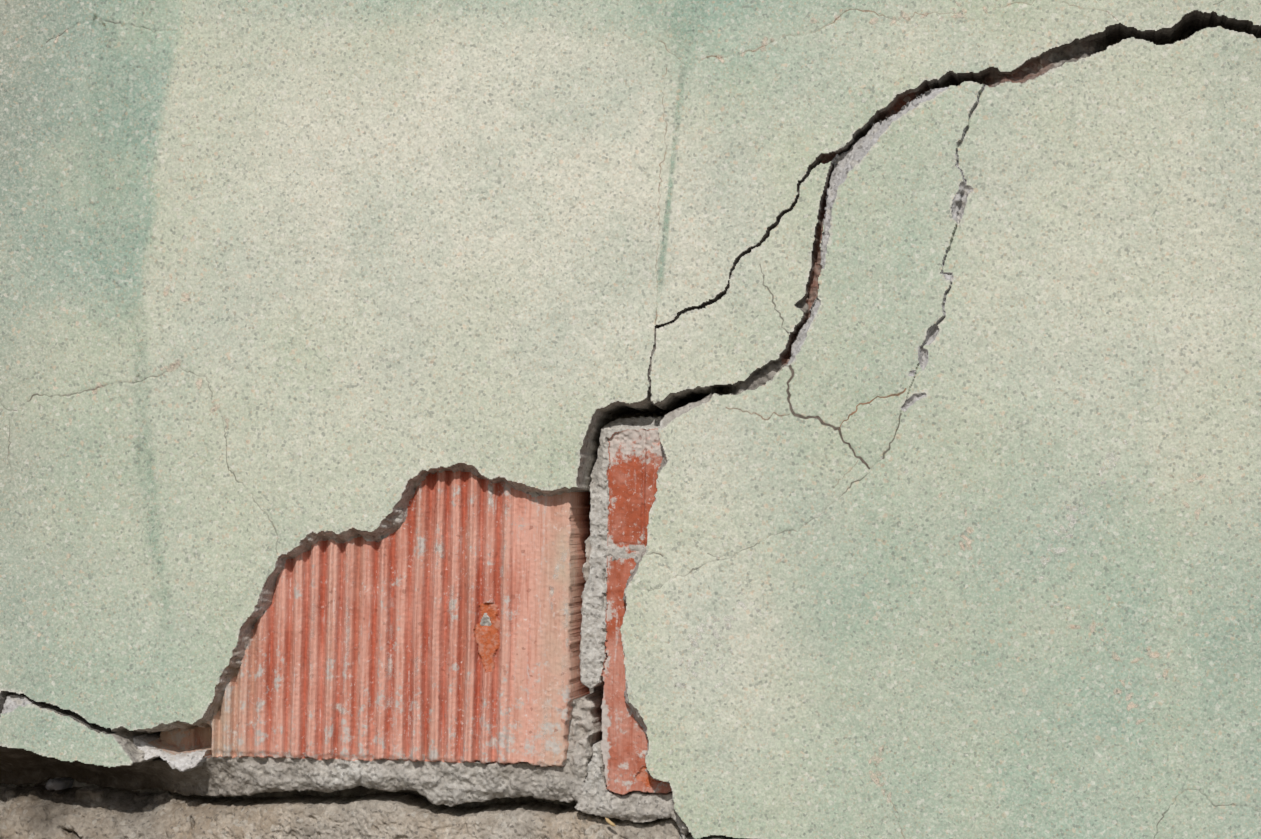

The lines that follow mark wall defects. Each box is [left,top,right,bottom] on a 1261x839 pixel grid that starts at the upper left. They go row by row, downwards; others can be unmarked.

crack [620,10,1261,469]
spalling [0,386,711,768]
crack [0,691,115,734]
crack [589,684,605,694]
spalling [620,545,730,839]
crack [202,785,426,799]
crack [459,796,578,808]
crack [697,831,749,839]